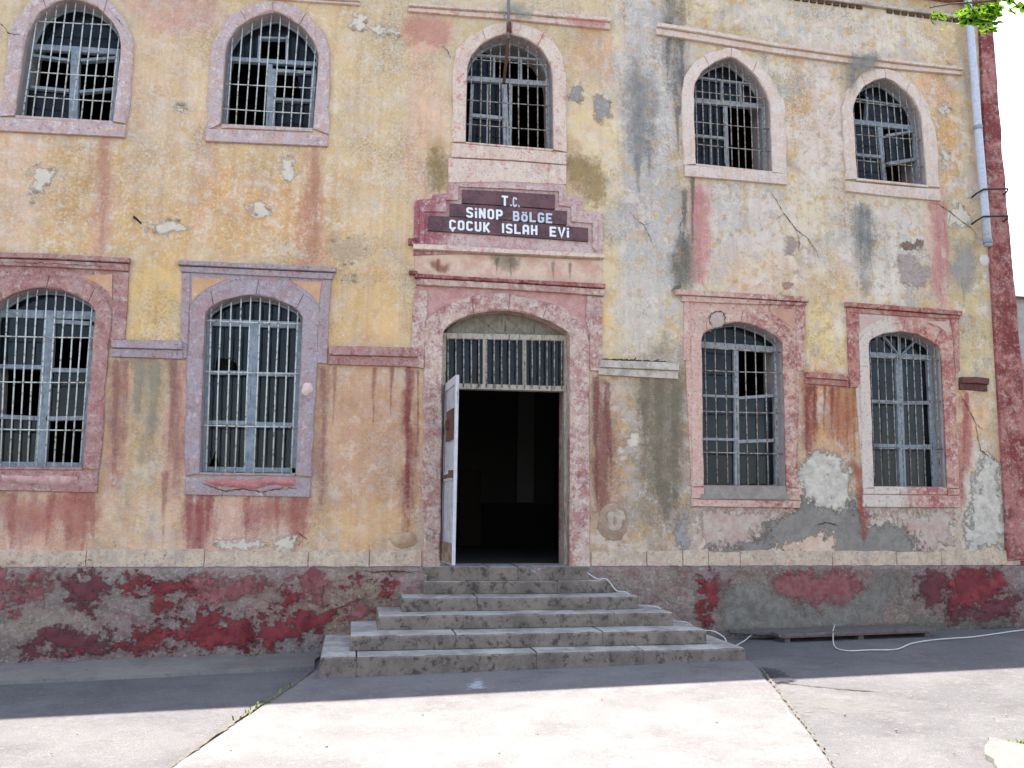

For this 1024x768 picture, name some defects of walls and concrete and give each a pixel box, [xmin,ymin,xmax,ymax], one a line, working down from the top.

water stain [628,69,653,176]
water stain [667,38,684,134]
peeling [26,162,56,207]
peeling [144,218,189,235]
peeling [243,199,273,219]
water stain [672,177,695,290]
corrosion [805,387,855,444]
crack [961,396,1000,462]
flaking render [797,448,859,516]
peeling [673,507,867,614]
flaking render [869,451,1022,629]
peeling [0,559,400,663]